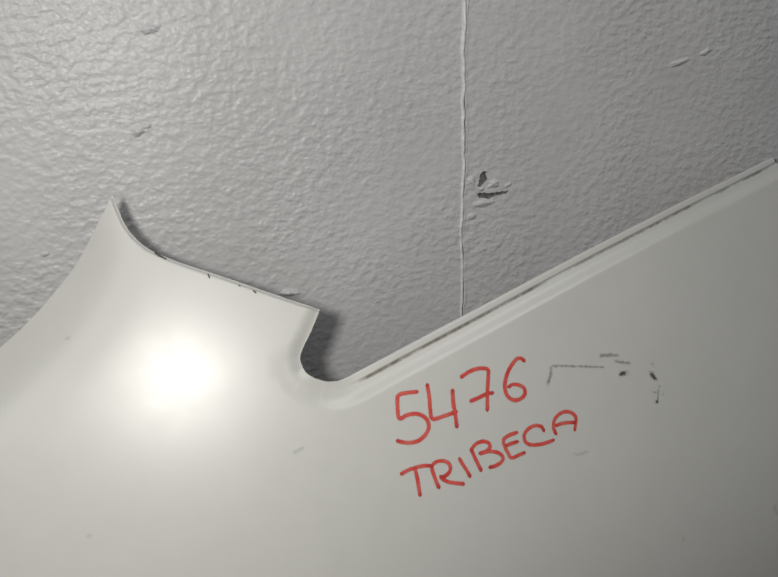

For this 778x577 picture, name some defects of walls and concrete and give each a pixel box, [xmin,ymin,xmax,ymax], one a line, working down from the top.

crack [459,0,470,317]
spalling [466,171,512,221]